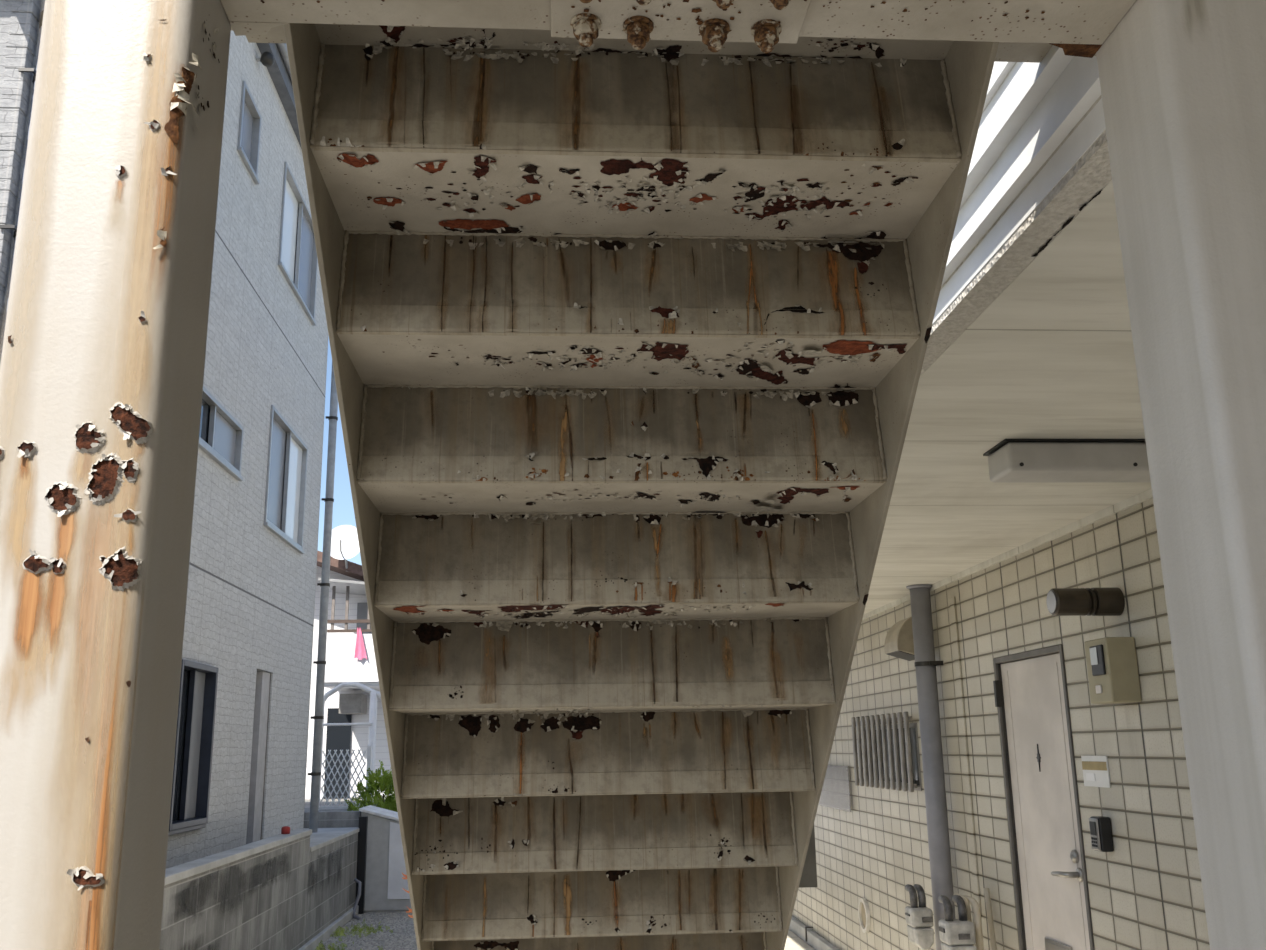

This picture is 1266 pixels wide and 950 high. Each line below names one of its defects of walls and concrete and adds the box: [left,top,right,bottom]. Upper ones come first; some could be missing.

peeling [164,20,220,144]
corrosion [473,51,485,147]
corrosion [571,56,580,150]
peeling [320,136,379,184]
peeling [413,139,918,296]
peeling [429,318,907,408]
corrosion [0,3,184,950]
peeling [472,453,866,538]
corrosion [635,524,676,602]
peeling [458,707,602,740]
corrosion [741,712,787,853]
corrosion [553,800,578,944]